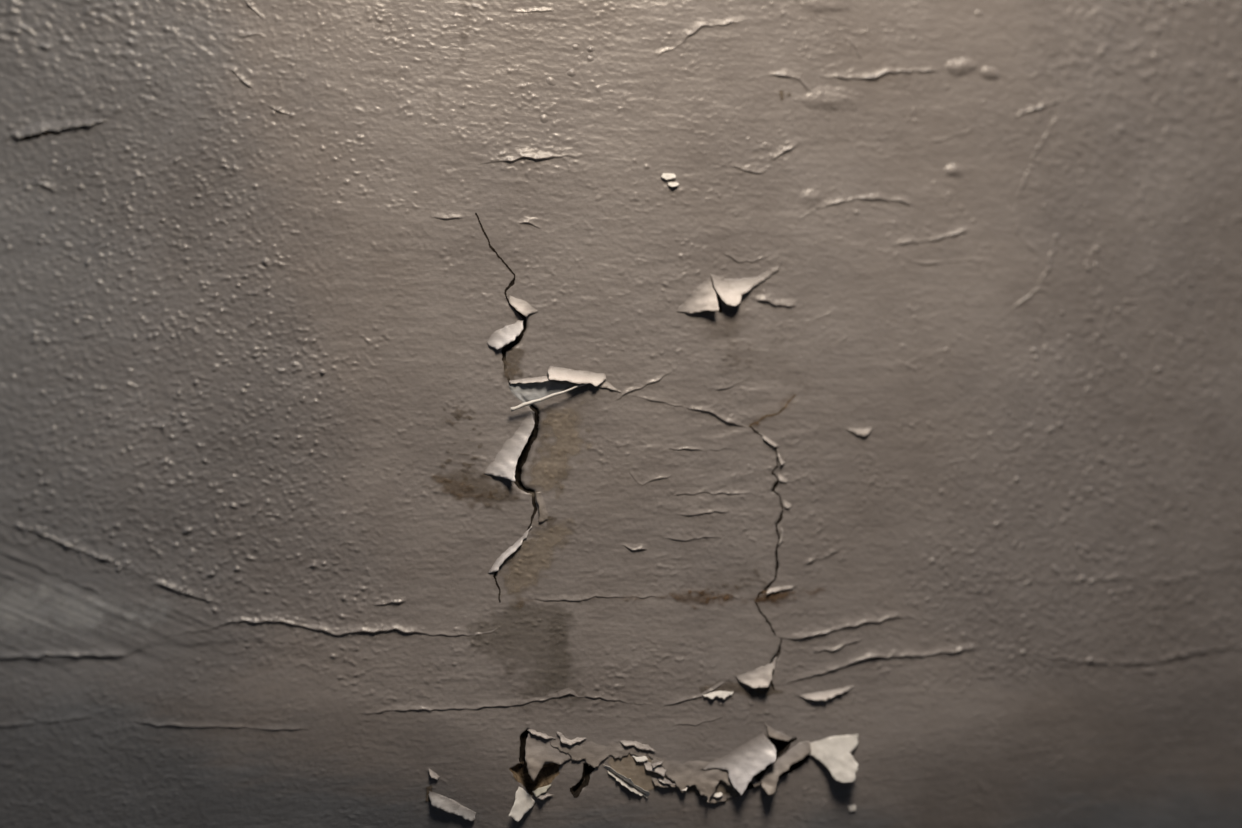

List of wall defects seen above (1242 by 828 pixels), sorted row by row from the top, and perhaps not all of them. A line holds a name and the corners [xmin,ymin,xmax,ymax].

peeling [9,119,108,141]
peeling [677,264,781,314]
crack [475,213,622,609]
crack [685,394,797,690]
peeling [660,653,782,707]
peeling [799,684,857,701]
peeling [426,769,476,821]
peeling [509,723,859,822]